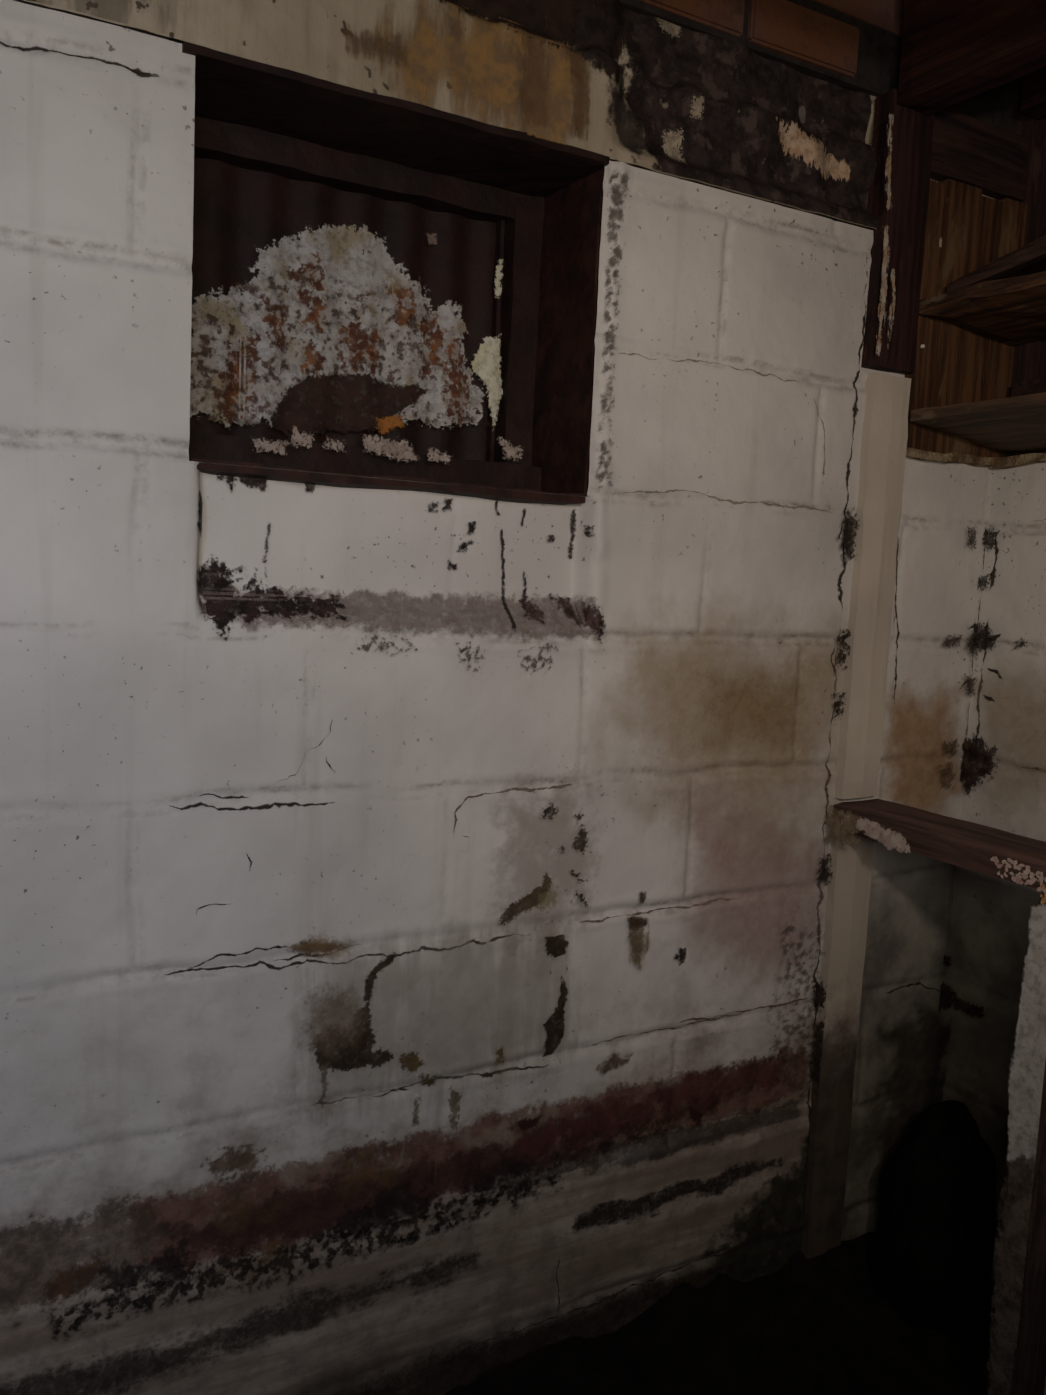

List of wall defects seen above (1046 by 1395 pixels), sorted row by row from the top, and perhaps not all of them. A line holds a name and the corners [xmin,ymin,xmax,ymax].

crack [0,41,159,78]
peeling [776,117,850,181]
peeling [190,223,523,465]
crack [581,261,868,1117]
mould [943,622,997,660]
crack [172,722,335,811]
leakage [888,702,999,810]
crack [166,934,530,975]
spalling [307,952,397,1107]
spalling [543,976,569,1057]
leakage [0,1166,562,1395]
leakage [336,1135,810,1395]